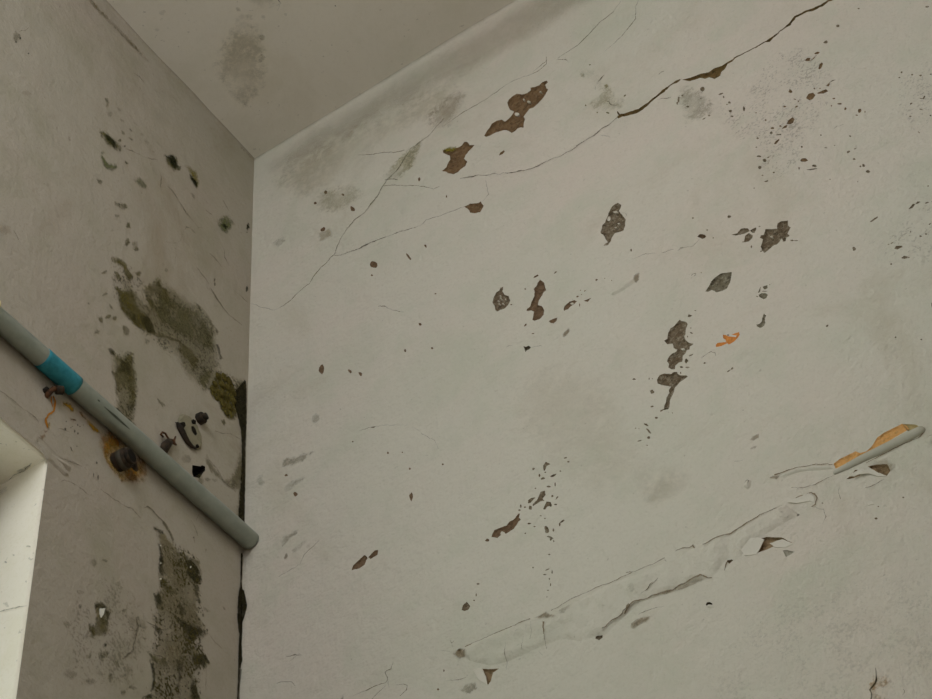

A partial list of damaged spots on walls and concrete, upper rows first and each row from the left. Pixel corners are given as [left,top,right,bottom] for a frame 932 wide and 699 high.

damp [166,155,198,187]
spalling [443,142,474,174]
spalling [484,81,548,137]
crack [510,0,832,173]
spalling [732,221,798,253]
corrosion [45,396,124,479]
damp [111,351,136,422]
damp [99,258,222,387]
crack [232,380,247,522]
spalling [635,310,716,446]
damp [145,506,209,699]
crack [237,553,247,699]